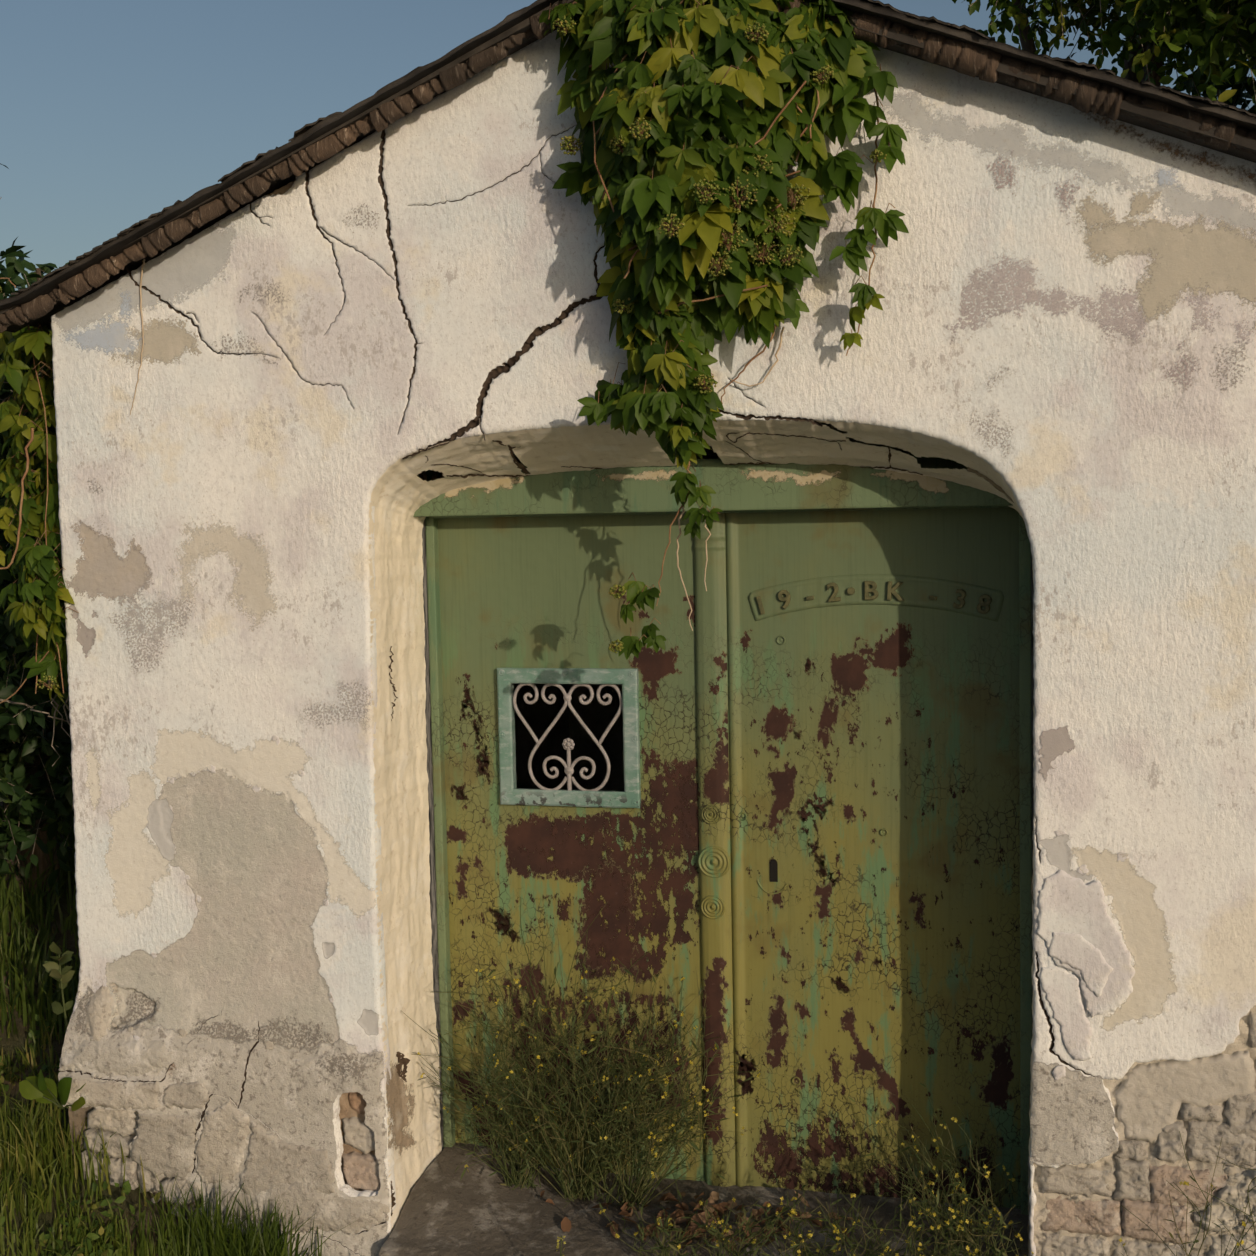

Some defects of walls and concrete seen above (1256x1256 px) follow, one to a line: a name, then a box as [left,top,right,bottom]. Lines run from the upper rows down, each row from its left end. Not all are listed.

crack [125,265,354,409]
crack [305,125,608,478]
crack [719,378,923,475]
peeling [66,520,154,657]
spalling [58,728,390,1256]
spalling [446,622,1256,1256]
crack [192,1016,280,1174]